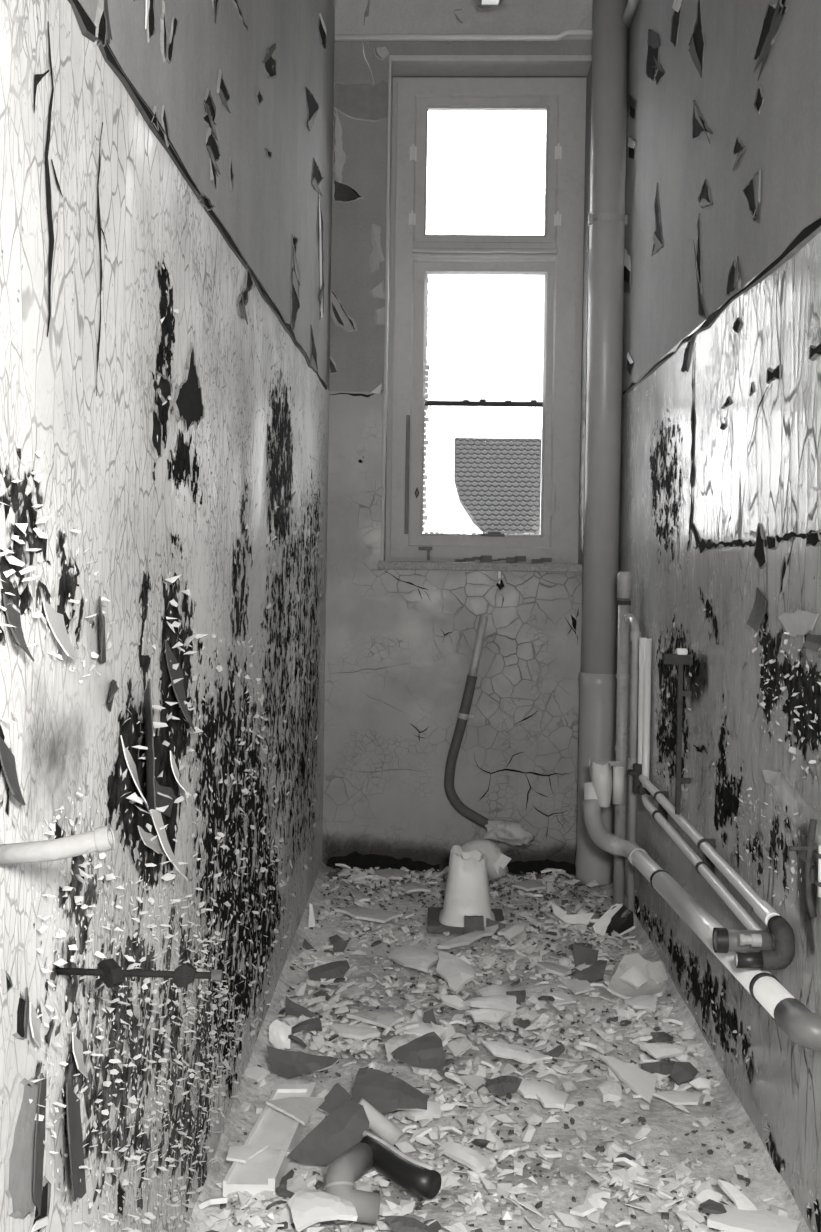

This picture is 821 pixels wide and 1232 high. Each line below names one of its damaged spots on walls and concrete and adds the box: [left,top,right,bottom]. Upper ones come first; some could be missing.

peeling [646,0,705,85]
peeling [753,0,788,115]
crack [34,21,63,337]
crack [96,121,108,396]
peeling [67,0,389,390]
peeling [149,252,205,518]
crack [687,346,821,582]
crack [385,571,431,601]
peeling [0,364,325,1232]
flaking render [327,851,439,872]
crack [474,752,568,838]
crack [693,745,708,754]